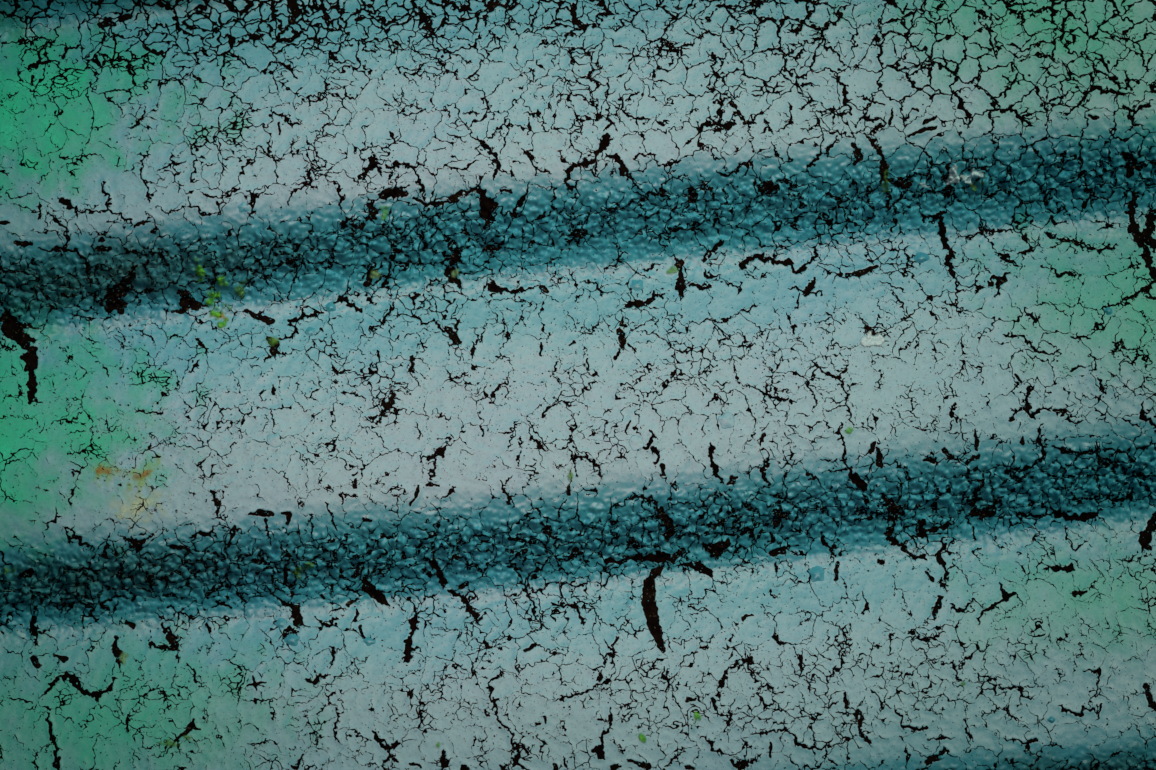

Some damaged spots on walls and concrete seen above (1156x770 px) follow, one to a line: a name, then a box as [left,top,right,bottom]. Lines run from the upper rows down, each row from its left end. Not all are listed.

peeling [1120,151,1156,302]
peeling [0,309,43,406]
peeling [630,492,687,653]
peeling [1137,511,1156,553]
crack [1045,684,1156,770]